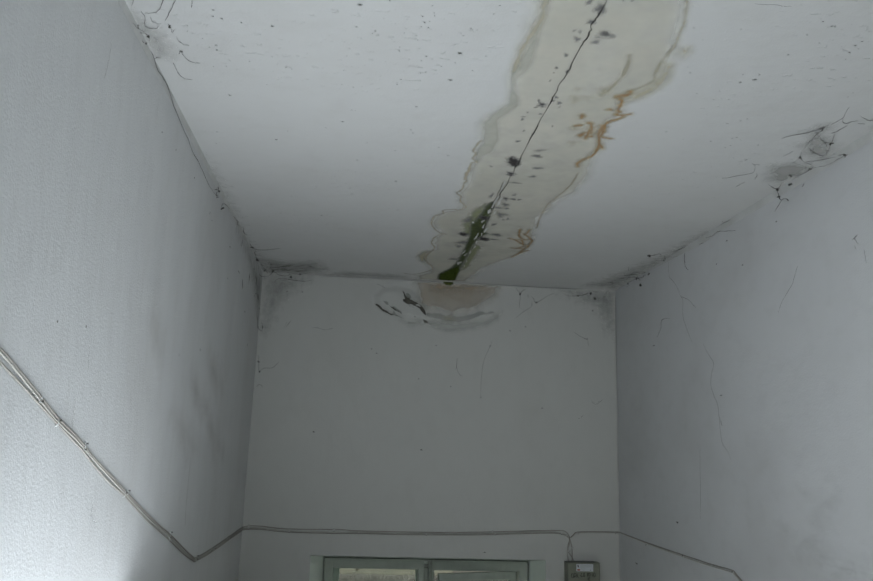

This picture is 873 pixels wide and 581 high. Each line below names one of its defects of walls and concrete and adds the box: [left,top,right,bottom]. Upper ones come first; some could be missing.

crack [151,52,216,195]
crack [455,1,607,267]
leakage [419,0,683,328]
rust [574,90,633,167]
peeling [375,292,431,325]